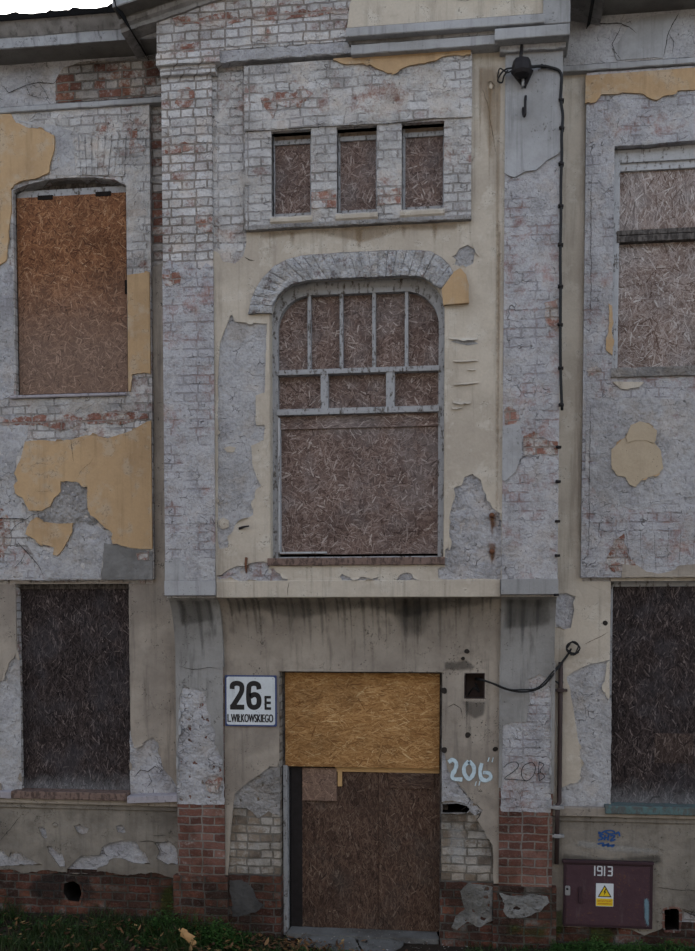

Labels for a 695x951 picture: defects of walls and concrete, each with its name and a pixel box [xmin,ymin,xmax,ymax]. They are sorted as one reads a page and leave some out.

crack [600,23,636,58]
peeling [585,68,695,105]
peeling [0,114,79,400]
peeling [0,410,153,581]
peeling [216,316,267,549]
peeling [438,474,502,581]
spalling [585,381,695,510]
peeling [0,650,22,790]
peeling [129,686,280,818]
peeling [493,660,612,813]
peeling [48,840,178,905]
spalling [452,883,550,930]